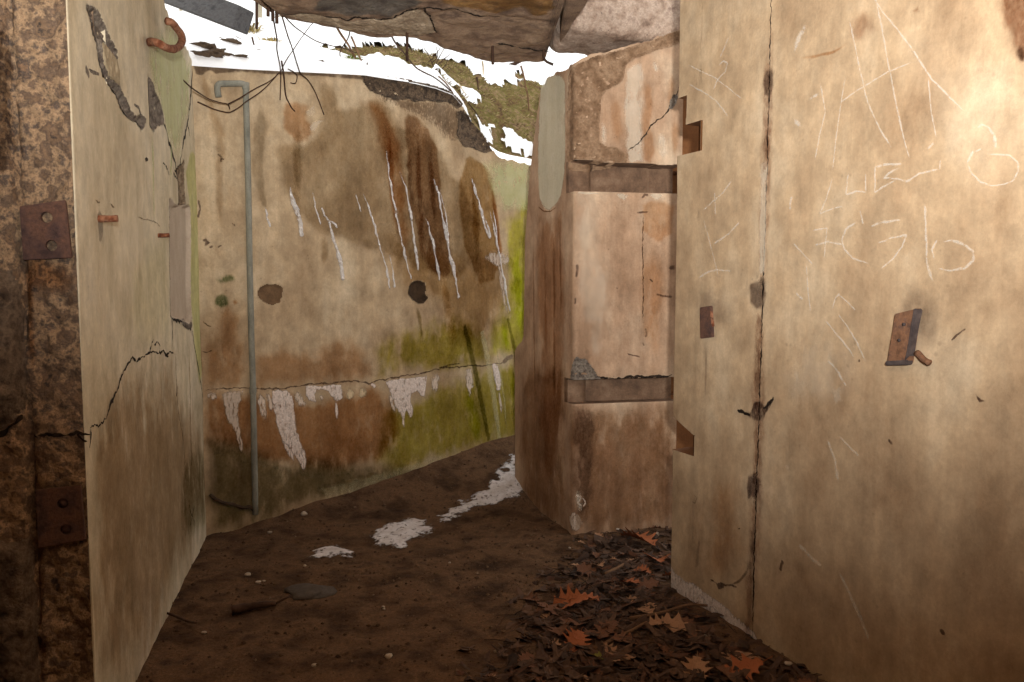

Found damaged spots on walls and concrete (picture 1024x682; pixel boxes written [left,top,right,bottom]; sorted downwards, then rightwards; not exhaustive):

crack [629,87,679,150]
water stain [356,196,396,288]
water stain [387,159,419,279]
water stain [427,180,460,298]
water stain [472,180,511,311]
crack [0,317,513,448]
water stain [466,369,477,394]
efflorescence [492,363,502,412]
spalling [570,357,600,380]
crack [737,0,774,636]